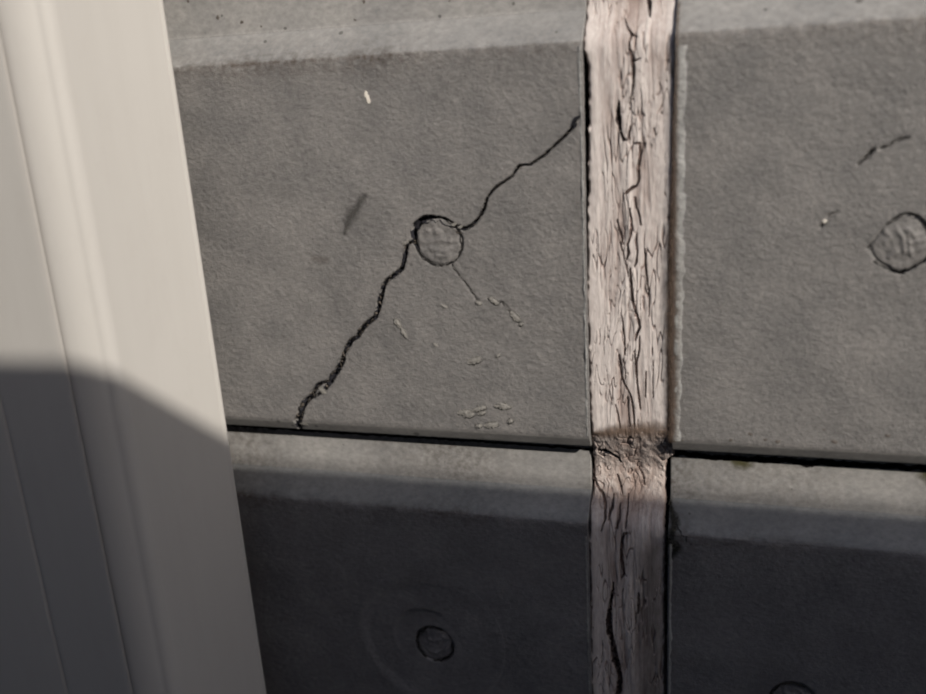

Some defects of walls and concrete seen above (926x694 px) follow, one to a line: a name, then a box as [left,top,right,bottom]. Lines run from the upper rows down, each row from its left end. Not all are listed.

crack [293,114,581,428]
crack [609,24,655,427]
crack [858,135,907,165]
crack [593,449,645,694]